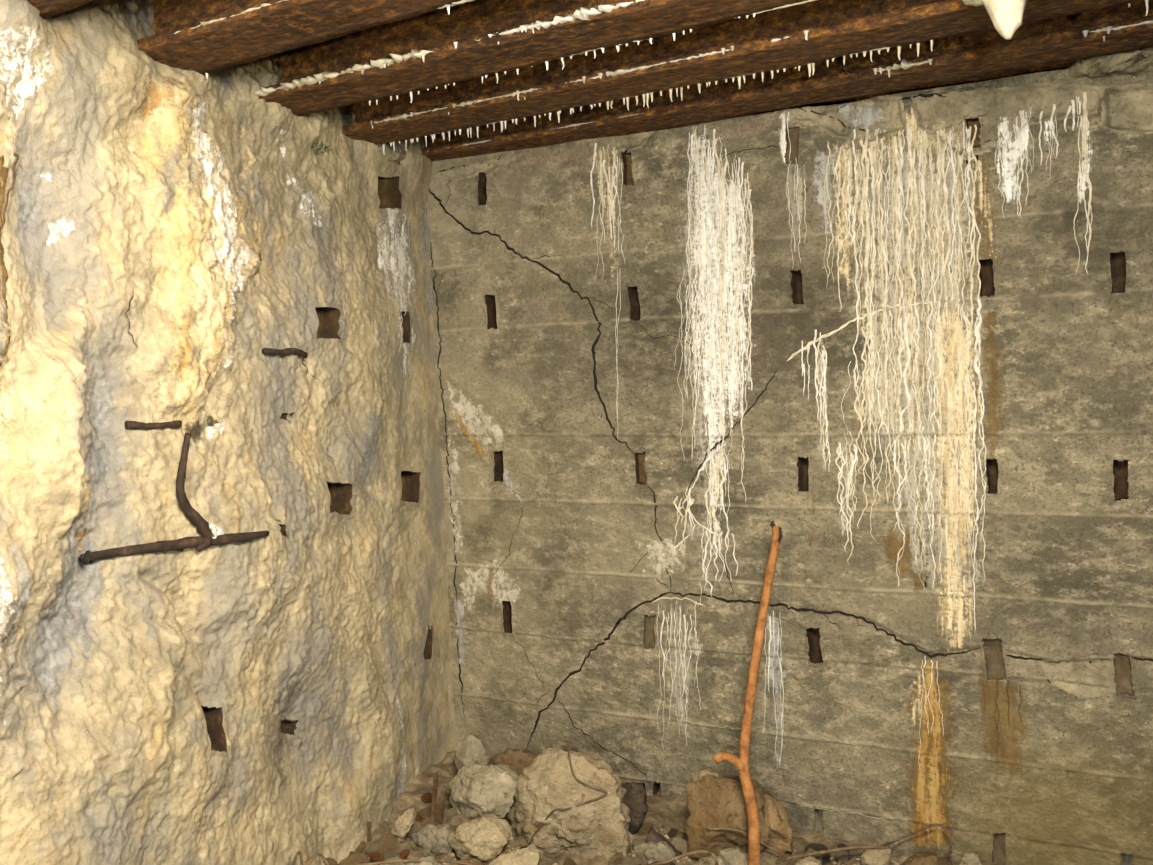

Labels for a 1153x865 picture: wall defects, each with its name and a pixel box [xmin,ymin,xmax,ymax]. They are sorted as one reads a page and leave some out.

damp [446,381,521,672]
crack [429,156,689,717]
efflorescence [475,0,644,45]
efflorescence [590,143,625,434]
efflorescence [369,38,933,155]
efflorescence [635,125,756,747]
crack [514,302,1060,786]
efflorescence [778,104,987,652]
corrosion [906,656,953,848]
corrosion [979,678,1025,788]
efflorescence [995,92,1093,274]
crack [1089,656,1153,664]